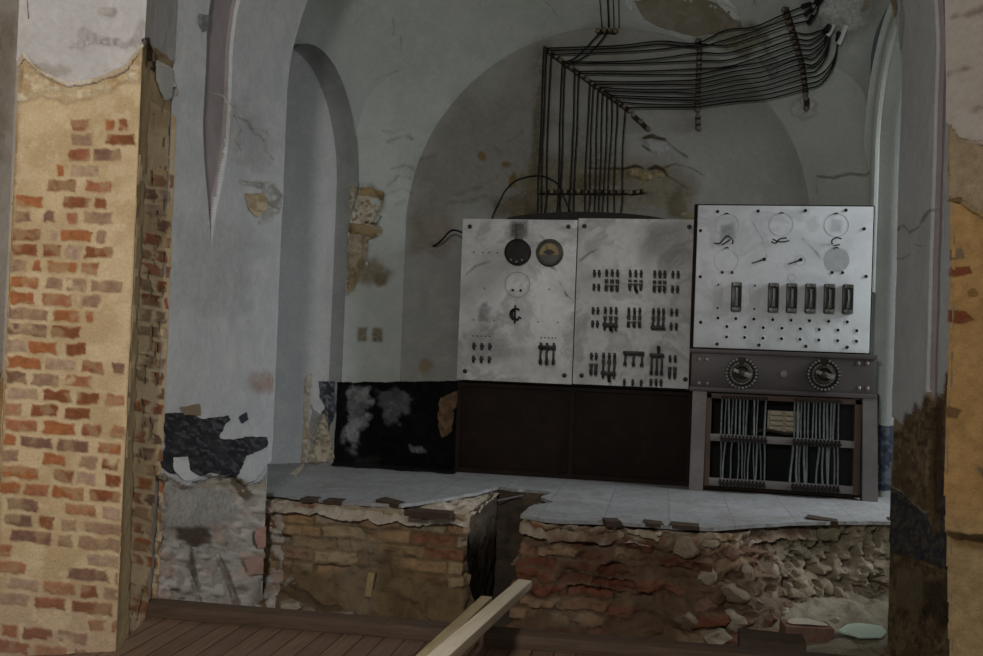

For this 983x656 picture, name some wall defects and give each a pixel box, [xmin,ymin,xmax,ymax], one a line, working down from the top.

spalling [624,0,766,58]
flaking render [591,134,700,188]
spalling [0,22,474,656]
spalling [878,127,983,656]
spalling [505,518,890,656]
spalling [807,514,838,526]